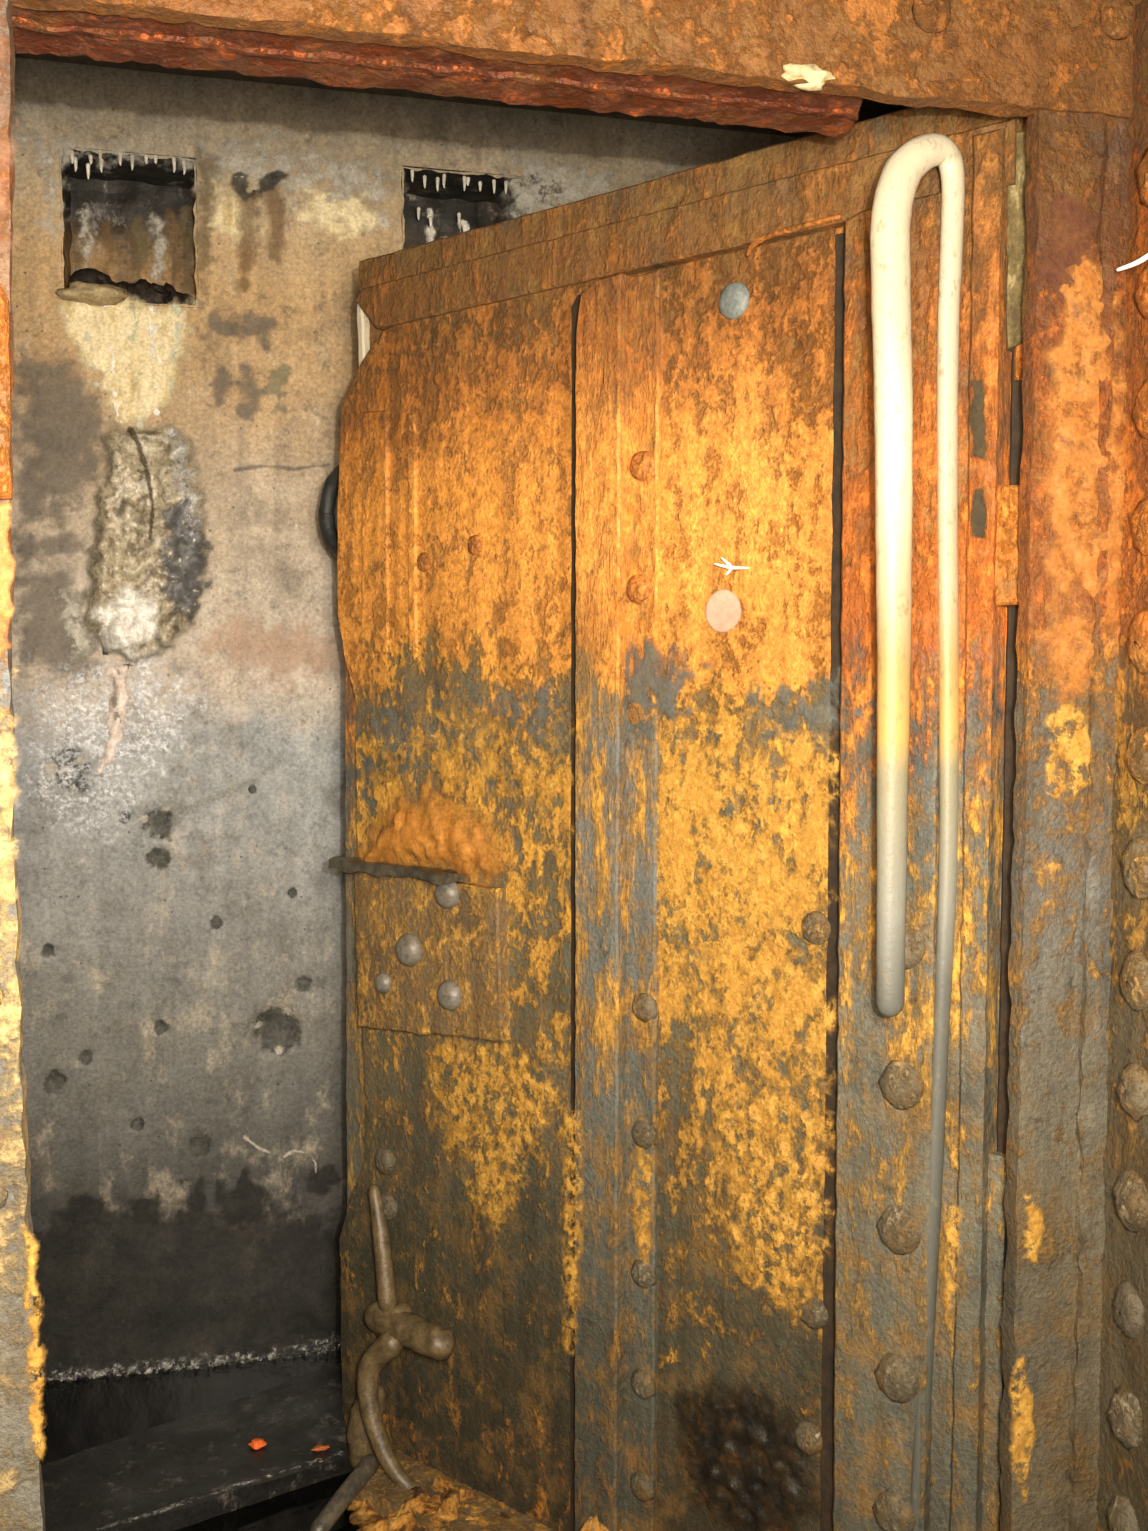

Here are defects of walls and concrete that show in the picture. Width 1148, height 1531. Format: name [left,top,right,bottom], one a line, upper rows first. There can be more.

damp [13,132,389,518]
corrosion [0,503,15,654]
damp [19,534,78,558]
corrosion [969,381,987,459]
corrosion [971,488,986,538]
corrosion [1041,256,1127,705]
damp [243,1135,340,1195]
damp [33,1173,345,1384]
corrosion [675,1387,818,1531]